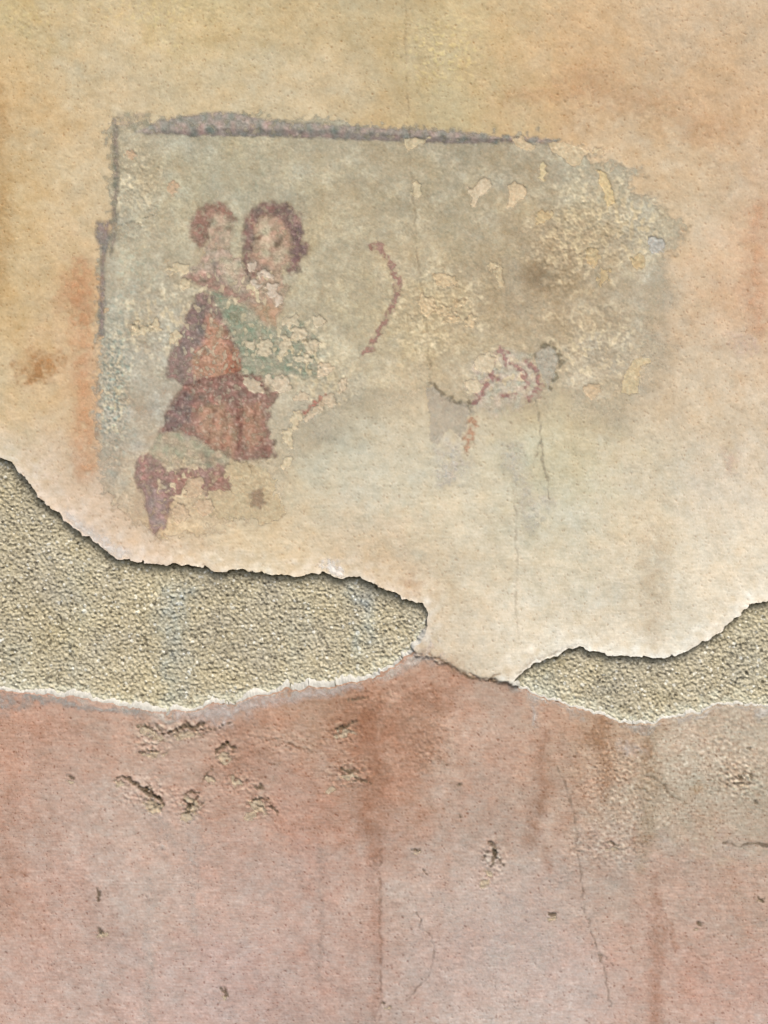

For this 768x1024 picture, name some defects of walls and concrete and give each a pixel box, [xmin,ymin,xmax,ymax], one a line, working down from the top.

peeling [405,136,431,150]
peeling [467,178,491,206]
peeling [507,181,527,208]
peeling [247,261,283,307]
peeling [419,273,477,328]
peeling [131,317,183,345]
peeling [429,352,496,404]
peeling [172,314,347,525]
flaking render [0,458,428,740]
flaking render [514,601,768,735]
flaking render [115,776,164,814]
flaking render [480,842,504,888]